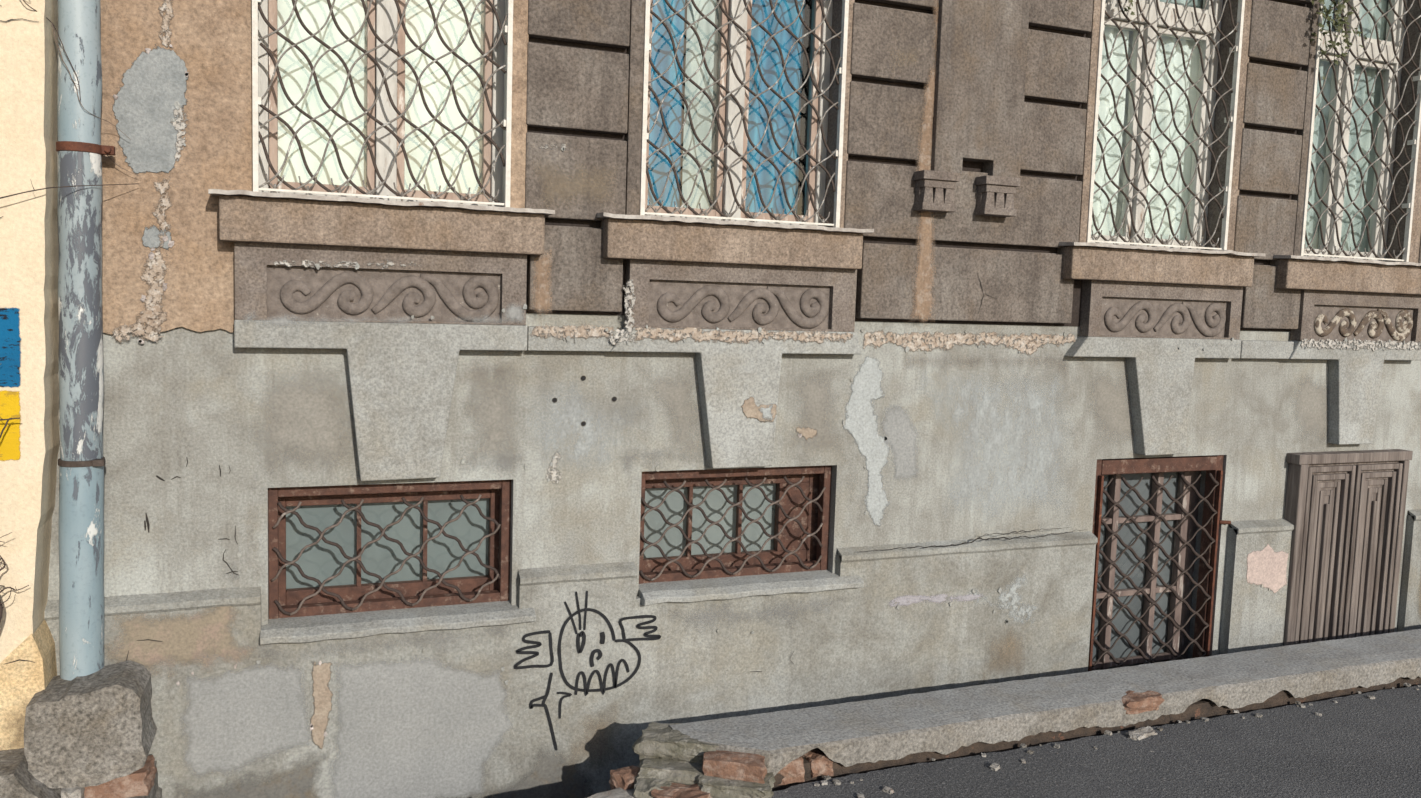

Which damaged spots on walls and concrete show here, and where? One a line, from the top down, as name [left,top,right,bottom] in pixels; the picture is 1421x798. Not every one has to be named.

flaking render [170,101,187,162]
flaking render [112,179,174,344]
peeling [483,280,1076,526]
flaking render [310,661,333,749]